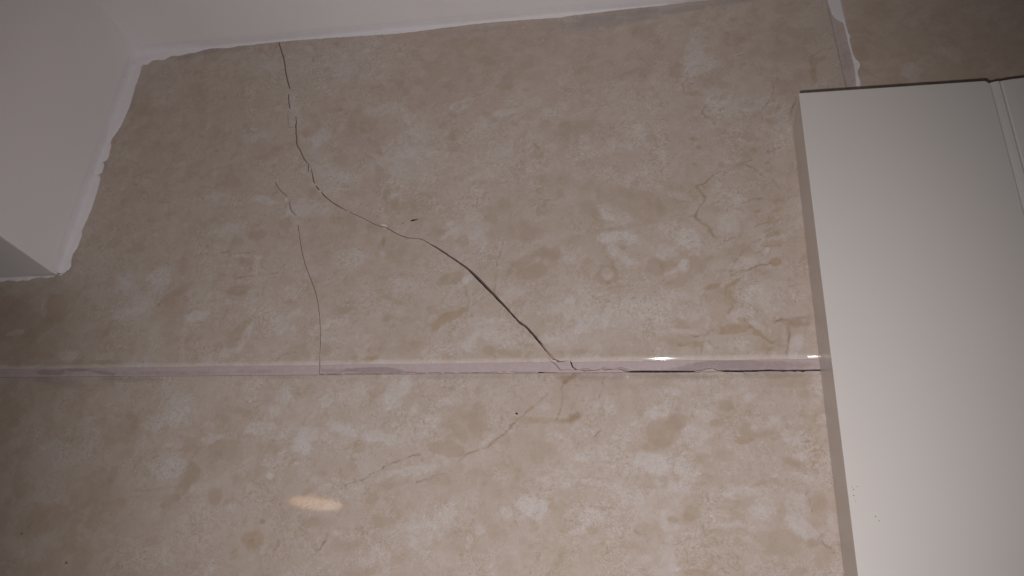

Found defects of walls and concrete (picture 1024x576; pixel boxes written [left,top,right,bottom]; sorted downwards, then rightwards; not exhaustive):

crack [275,42,821,374]